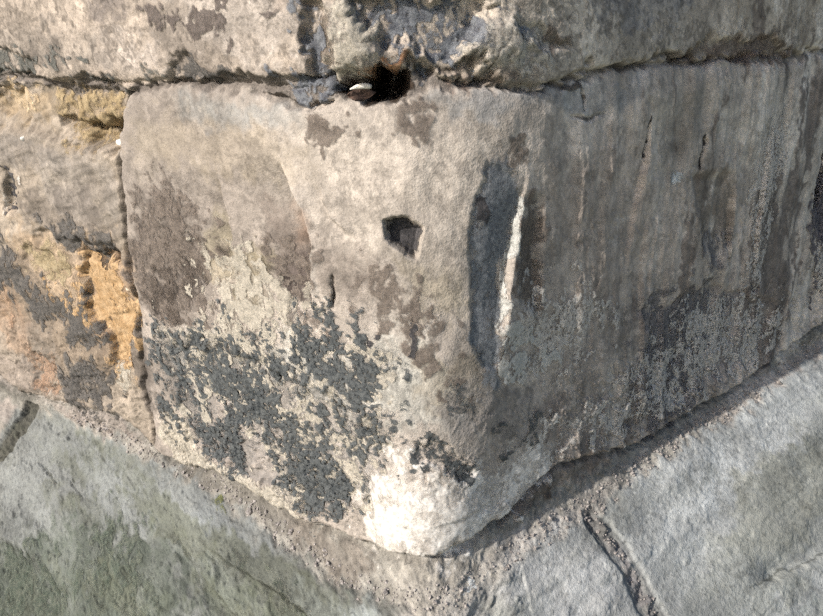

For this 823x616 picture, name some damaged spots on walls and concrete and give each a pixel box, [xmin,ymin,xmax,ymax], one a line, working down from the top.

peeling [0,165,19,215]
damp [457,133,551,393]
damp [736,114,795,301]
peeling [807,177,823,311]
damp [814,153,823,290]
peeling [0,196,792,557]
damp [348,264,466,403]